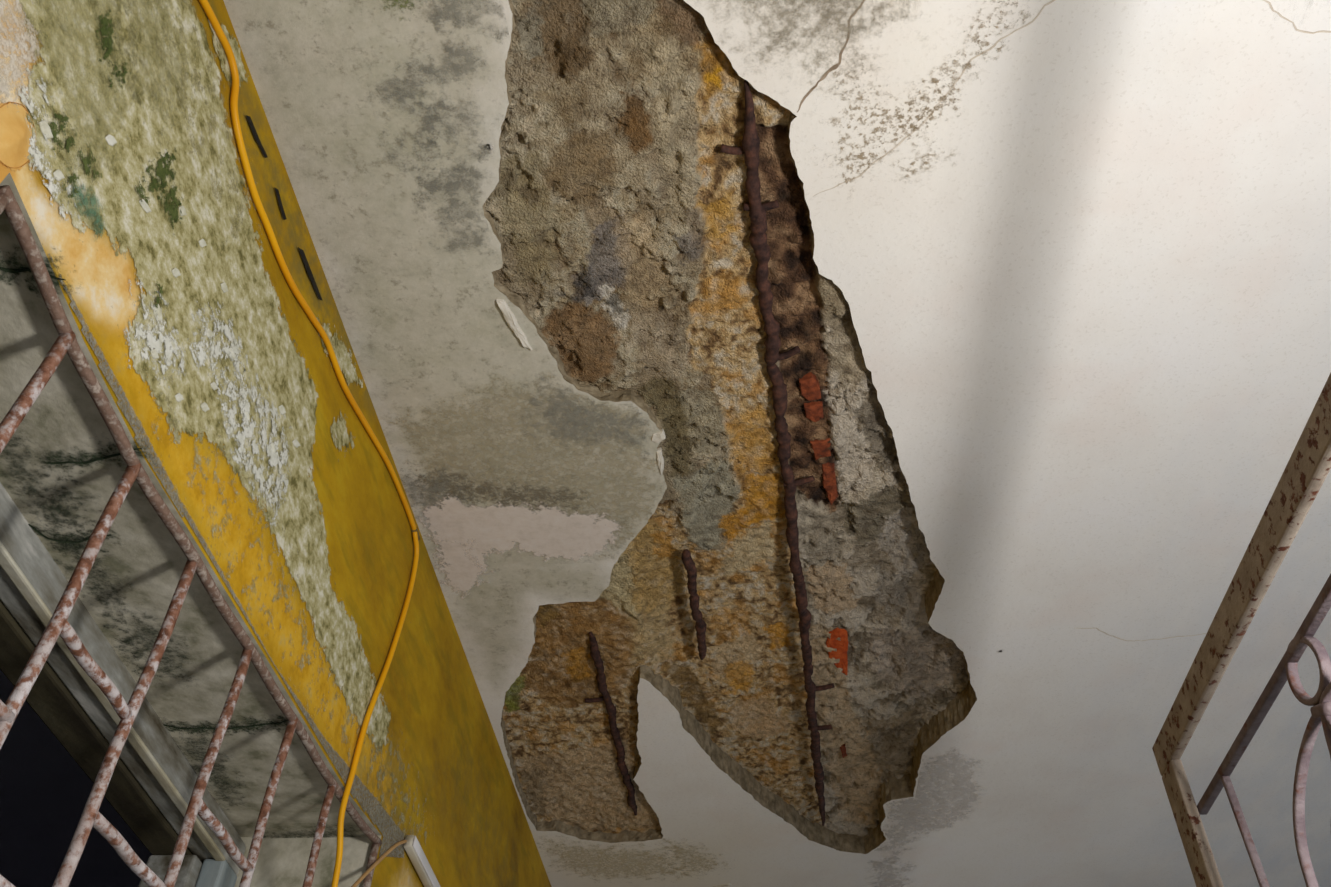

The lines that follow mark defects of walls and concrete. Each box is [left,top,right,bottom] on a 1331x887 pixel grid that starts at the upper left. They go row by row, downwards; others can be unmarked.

mould [379,46,479,159]
crack [797,0,865,113]
mould [832,2,1025,183]
crack [814,0,1055,196]
crack [1263,0,1331,34]
mould [411,147,489,251]
spalling [418,0,977,854]